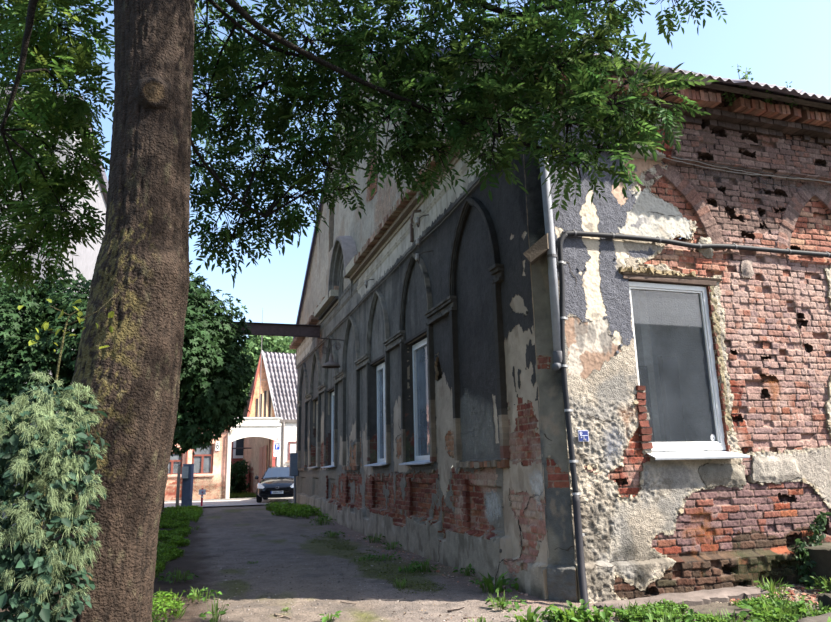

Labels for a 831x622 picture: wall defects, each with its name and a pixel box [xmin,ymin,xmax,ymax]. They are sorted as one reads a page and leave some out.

flaking render [657,80,831,113]
peeling [307,295,570,578]
peeling [565,190,623,380]
flaking render [584,427,650,498]
flaking render [612,120,831,600]